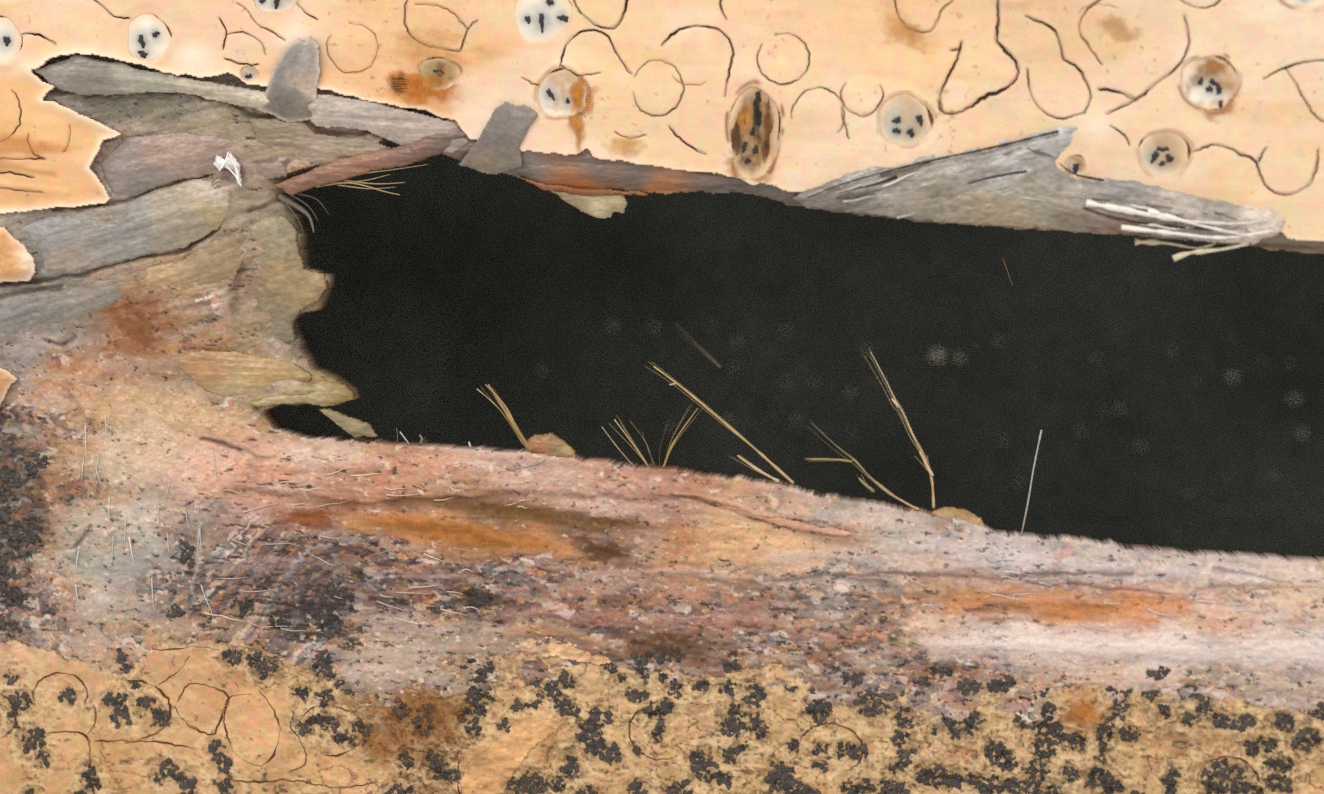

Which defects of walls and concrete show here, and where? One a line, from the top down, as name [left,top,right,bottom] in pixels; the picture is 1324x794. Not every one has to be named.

crack [219,3,285,66]
rust [390,74,454,103]
rust [569,77,592,149]
crack [522,0,884,154]
rust [731,100,773,179]
crack [894,0,1221,145]
crack [1195,60,1324,196]
peeling [0,55,468,343]
peeling [549,190,627,218]
peeling [0,368,19,407]
peeling [177,350,378,438]
rust [285,510,331,527]